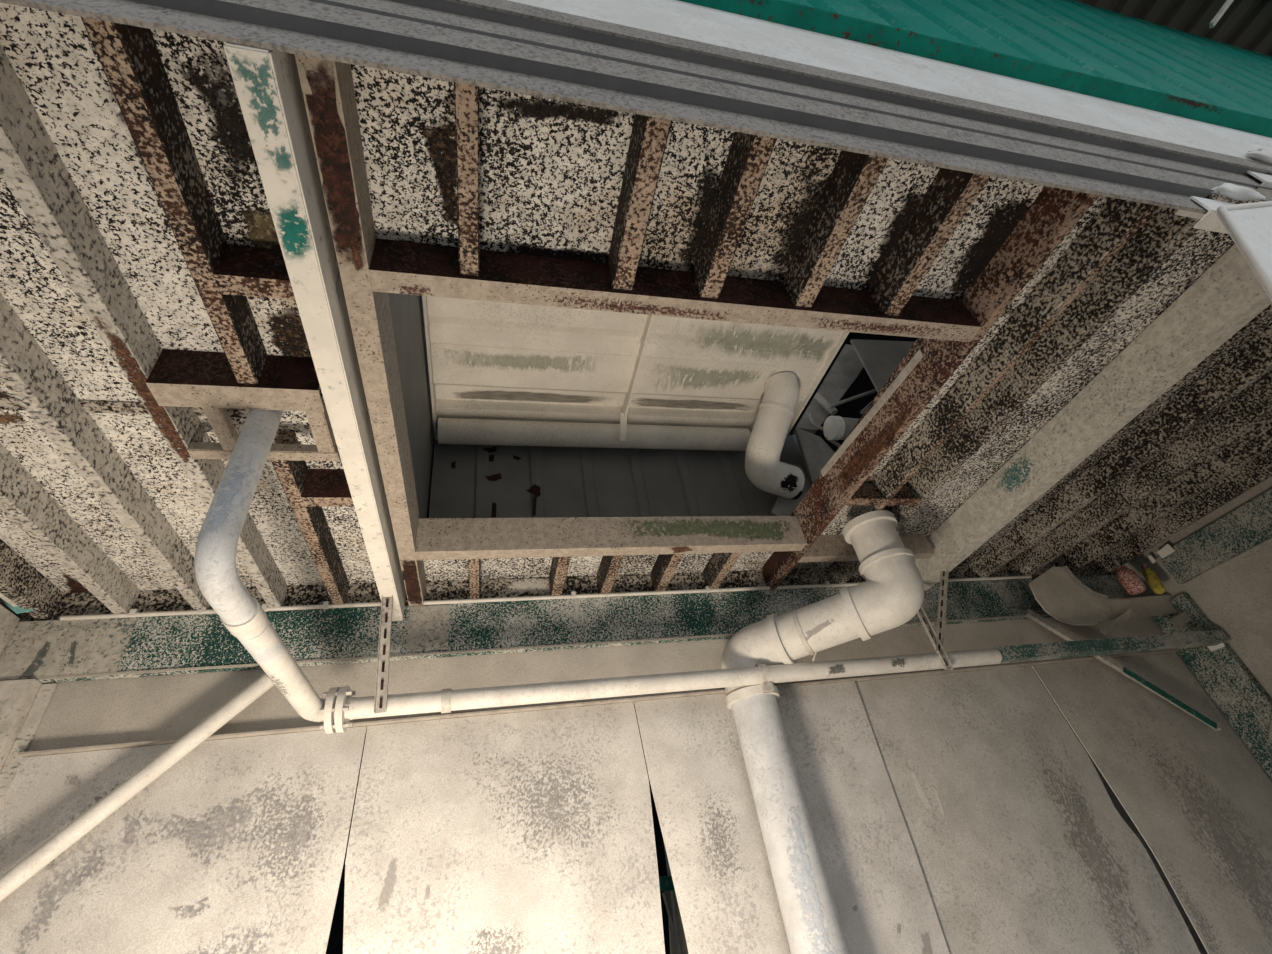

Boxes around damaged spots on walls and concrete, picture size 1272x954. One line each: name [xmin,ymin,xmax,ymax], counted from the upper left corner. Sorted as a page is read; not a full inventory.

corrosion [306,66,363,270]
corrosion [811,318,943,336]
corrosion [0,413,24,424]
corrosion [832,403,916,494]
corrosion [761,551,795,583]